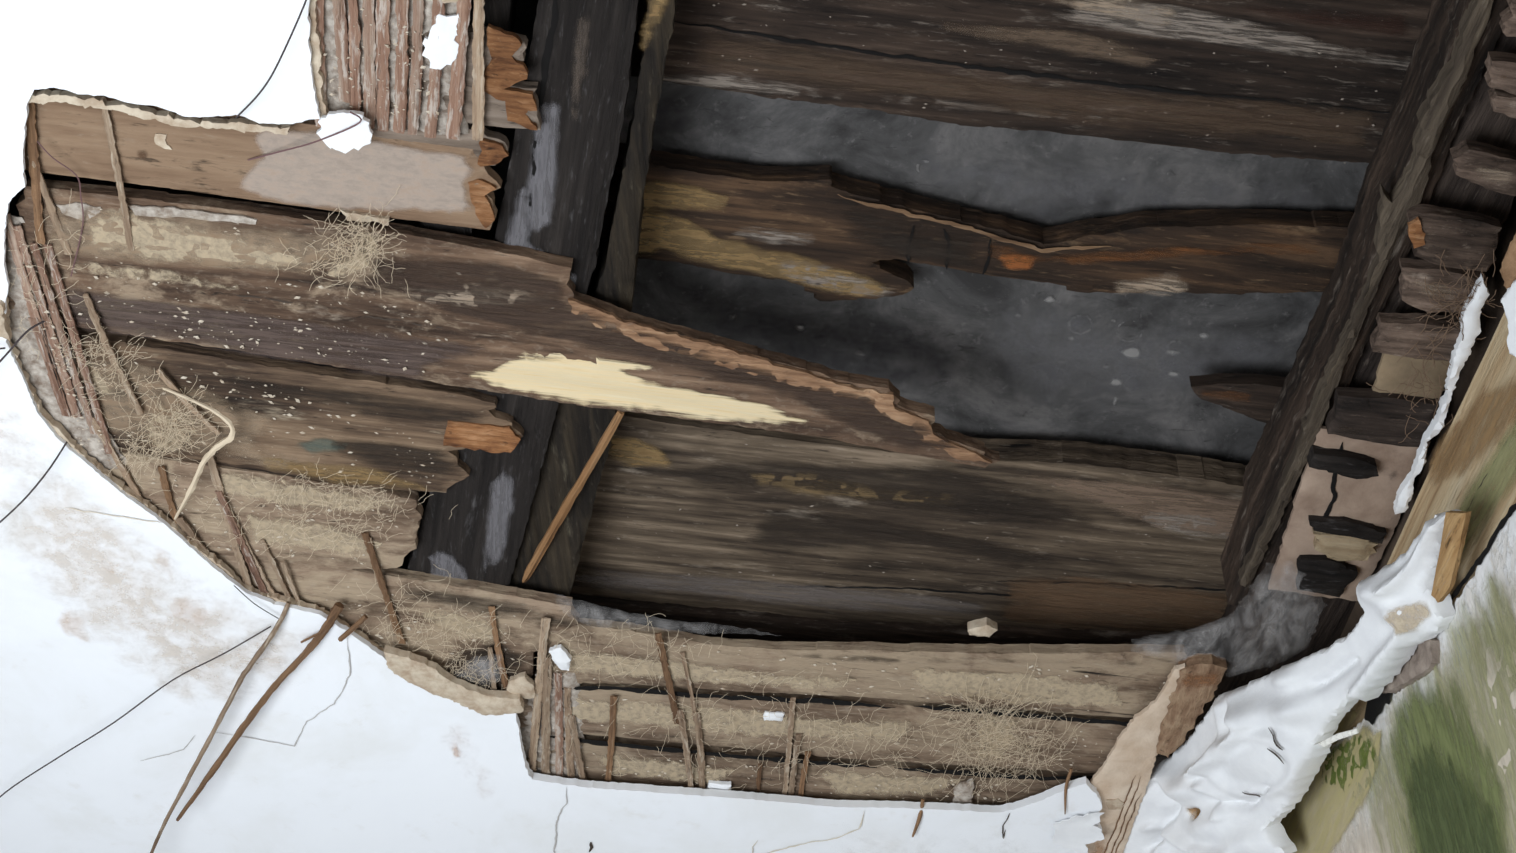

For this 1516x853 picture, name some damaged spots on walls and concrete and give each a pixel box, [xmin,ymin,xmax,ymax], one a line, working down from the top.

flaking render [309,0,329,118]
flaking render [29,89,291,150]
peeling [472,353,806,424]
flaking render [1372,169,1516,575]
crack [69,508,161,523]
flaking render [7,295,524,716]
flaking render [1340,601,1364,638]
crack [141,637,351,761]
flaking render [1052,663,1185,853]
damp [1280,578,1516,853]
crack [553,788,568,853]
crack [752,814,864,853]